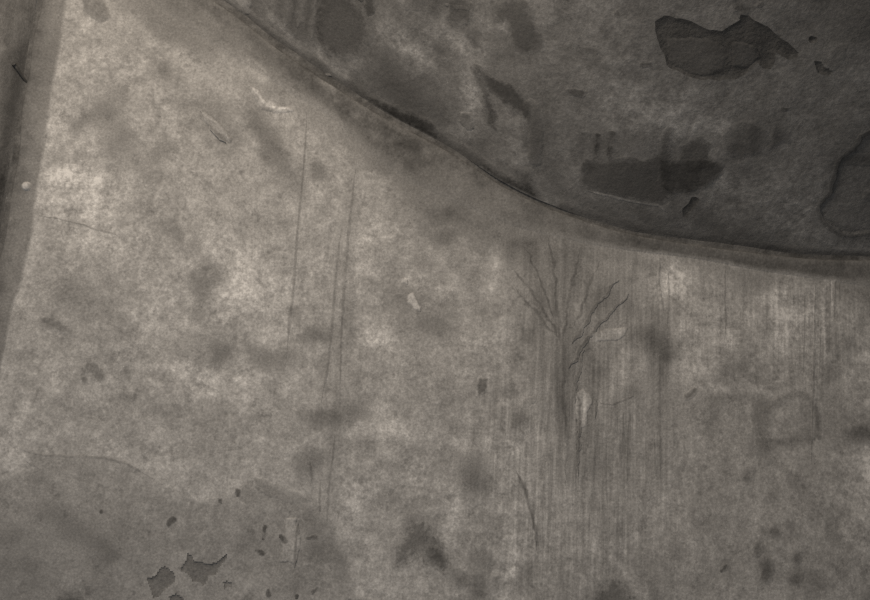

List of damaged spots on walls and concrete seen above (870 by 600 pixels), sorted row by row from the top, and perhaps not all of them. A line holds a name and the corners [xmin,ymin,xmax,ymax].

crack [0,0,43,256]
crack [39,215,117,236]
crack [212,0,870,358]